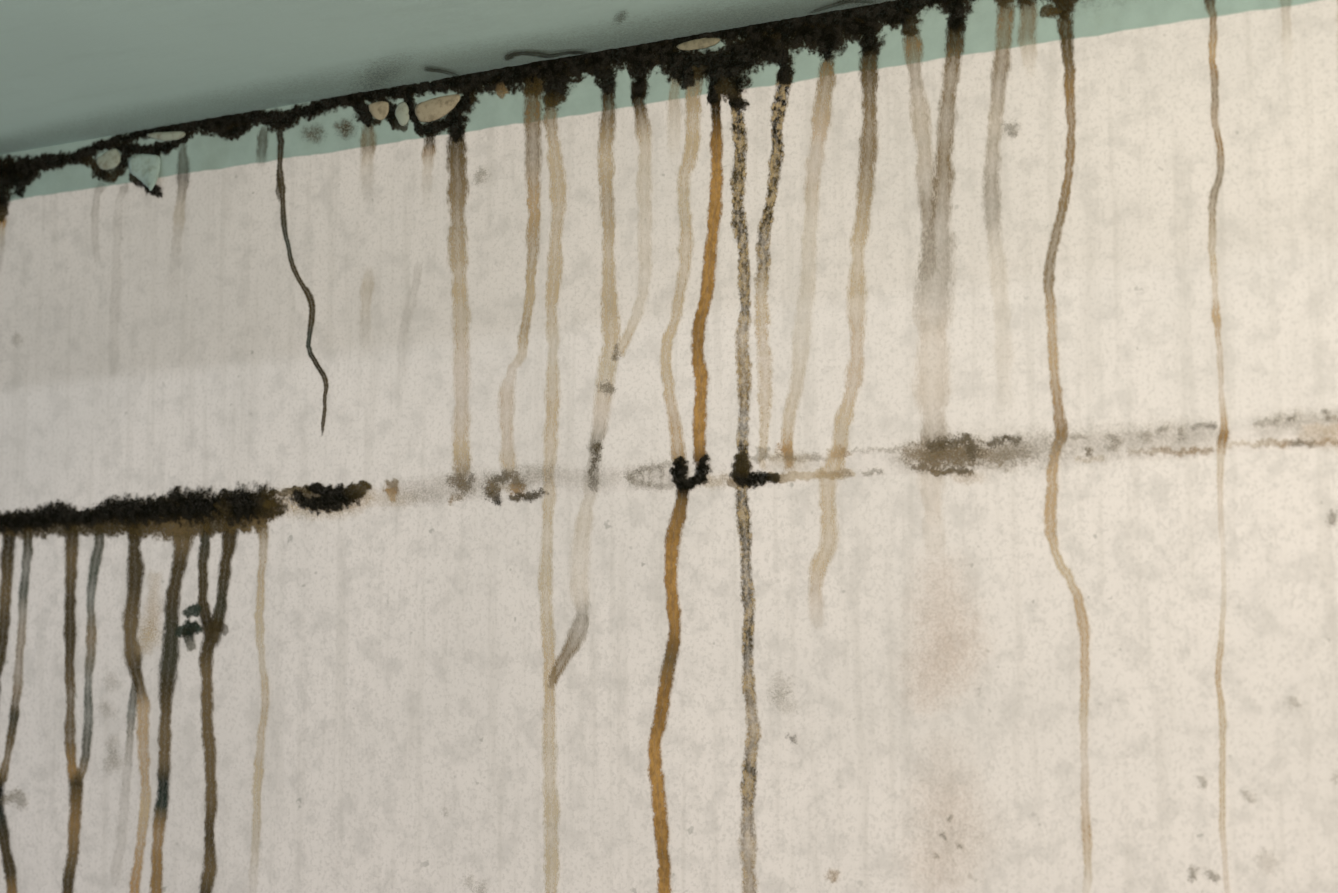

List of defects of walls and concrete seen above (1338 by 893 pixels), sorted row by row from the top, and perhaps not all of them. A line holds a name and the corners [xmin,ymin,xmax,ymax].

water stain [423,136,469,303]
water stain [447,438,552,519]
crack [0,0,1078,435]
water stain [518,85,565,345]
water stain [661,292,711,493]
rust [692,100,723,466]
water stain [727,78,796,893]
water stain [853,51,878,244]
water stain [921,28,964,213]
water stain [1204,0,1224,229]
water stain [0,480,398,893]
rust [648,488,689,893]